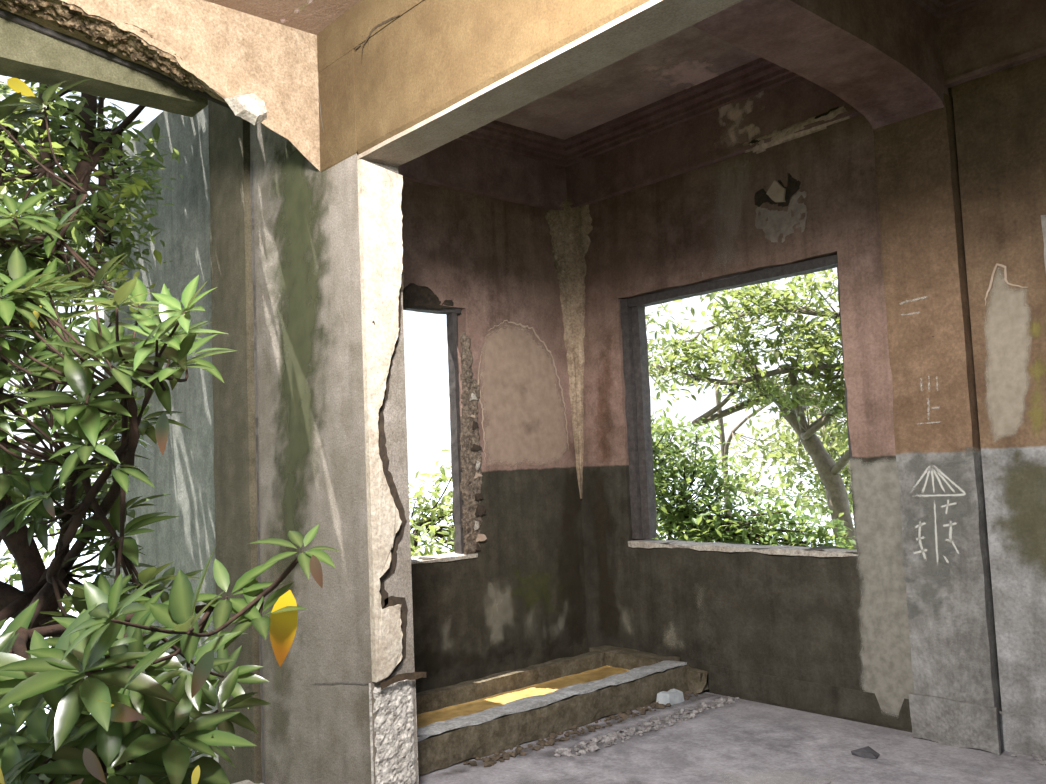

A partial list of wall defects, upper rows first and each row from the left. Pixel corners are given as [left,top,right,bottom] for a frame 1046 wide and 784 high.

spalling [0,0,267,125]
spalling [754,173,807,243]
spalling [743,106,851,154]
flaking render [460,320,569,555]
peeling [985,263,1030,438]
peeling [848,459,914,716]